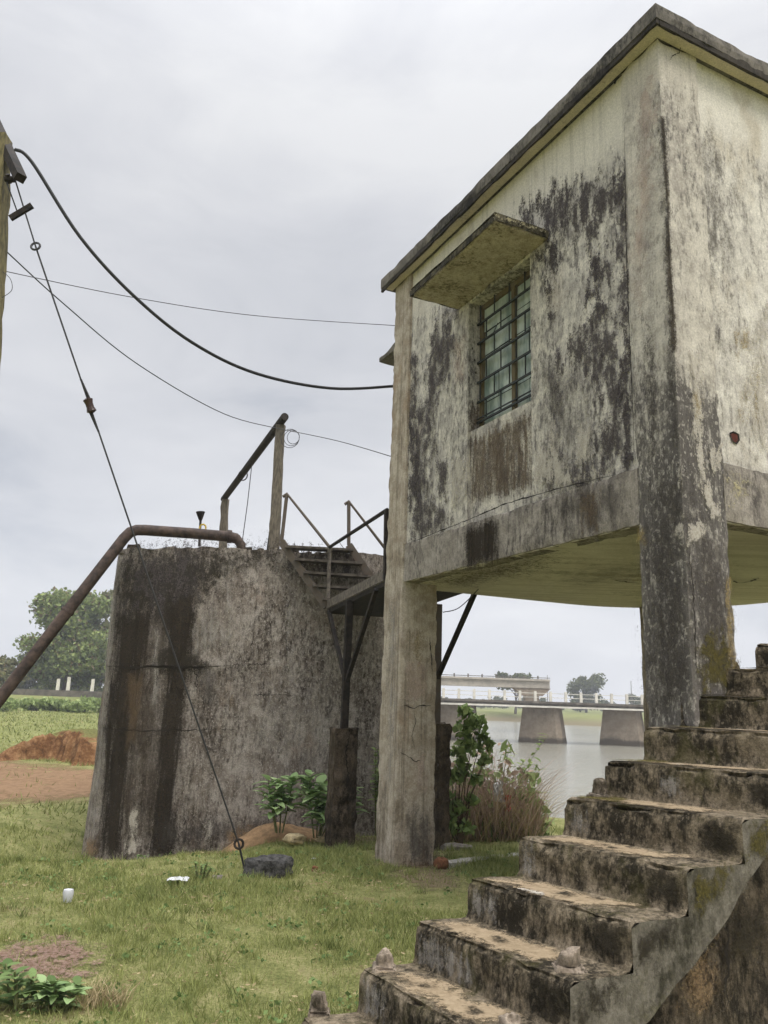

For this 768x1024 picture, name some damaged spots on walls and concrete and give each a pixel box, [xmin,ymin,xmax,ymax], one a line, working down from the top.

water stain [470,167,634,528]
water stain [643,116,679,455]
water stain [407,351,419,512]
water stain [436,456,448,504]
water stain [428,515,553,589]
water stain [93,539,257,859]
crack [400,705,430,765]